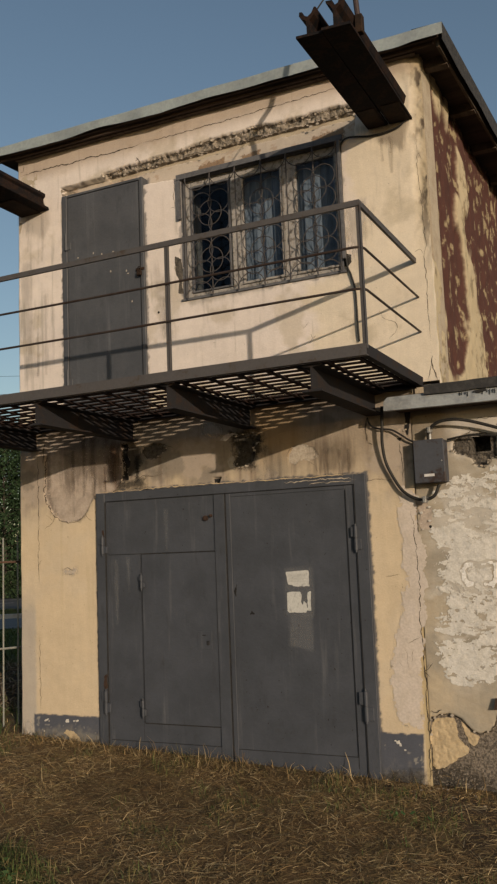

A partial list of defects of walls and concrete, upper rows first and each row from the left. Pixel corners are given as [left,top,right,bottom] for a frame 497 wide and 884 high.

spalling [100,106,355,180]
spalling [101,443,361,493]
peeling [390,433,497,792]